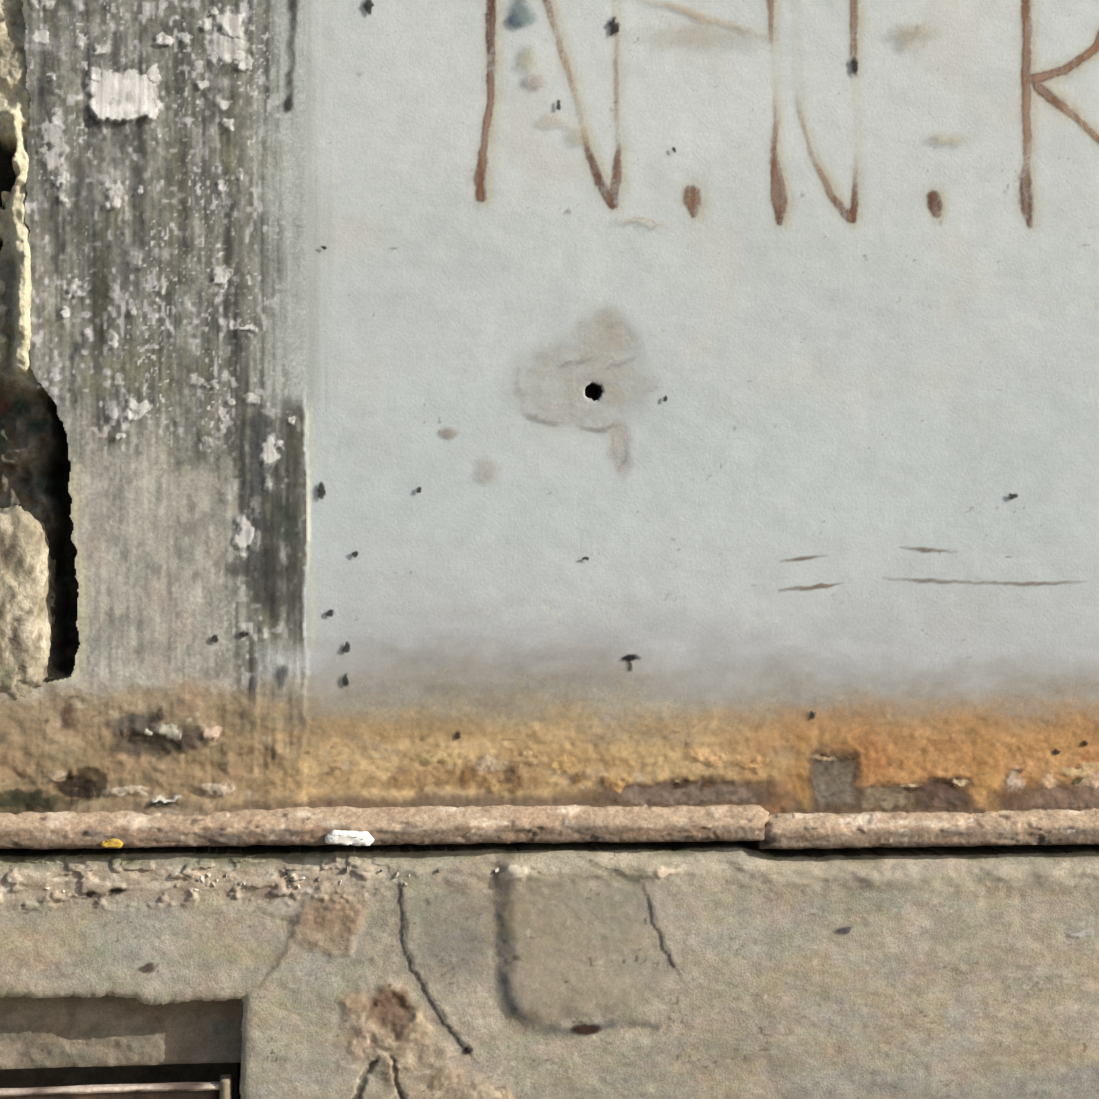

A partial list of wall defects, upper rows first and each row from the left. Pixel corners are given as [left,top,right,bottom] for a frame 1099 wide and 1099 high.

peeling [79,35,162,122]
peeling [155,32,190,45]
peeling [194,6,253,131]
peeling [38,107,70,203]
peeling [106,398,150,432]
peeling [260,436,283,489]
peeling [234,515,260,557]
water stain [229,409,304,622]
water stain [278,666,287,690]
spalling [342,989,434,1059]
crack [401,937,465,1048]
crack [352,1057,404,1099]